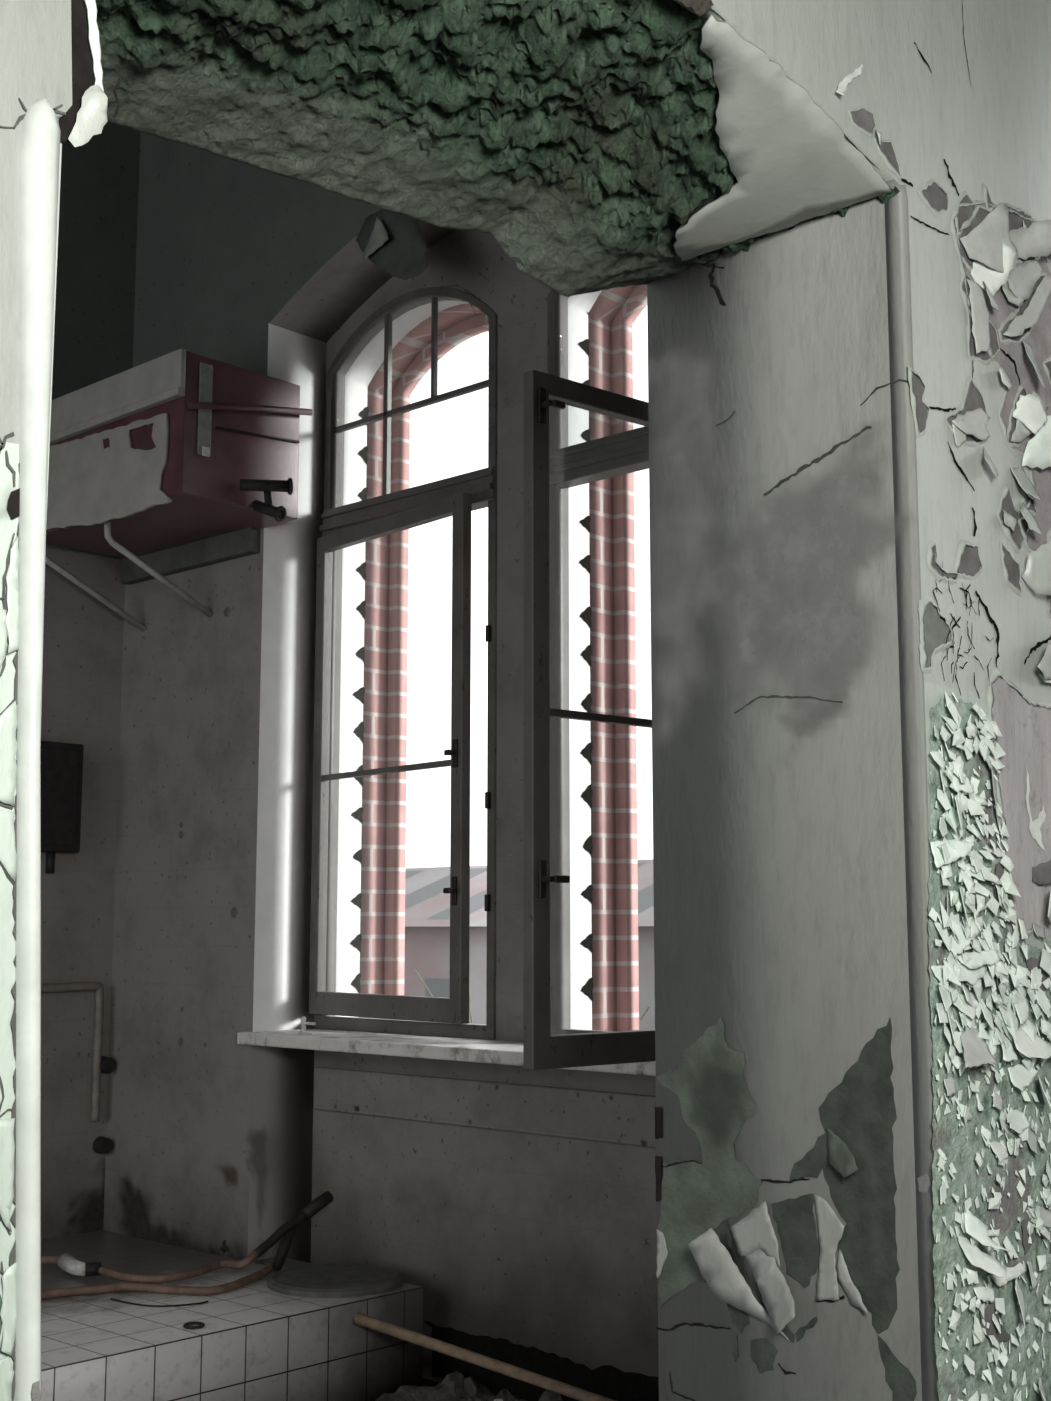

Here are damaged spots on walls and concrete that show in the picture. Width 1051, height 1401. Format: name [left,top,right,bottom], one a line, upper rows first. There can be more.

crack [0,432,16,486]
flaking render [96,0,1051,618]
peeling [656,1017,917,1401]
peeling [918,507,1051,1401]